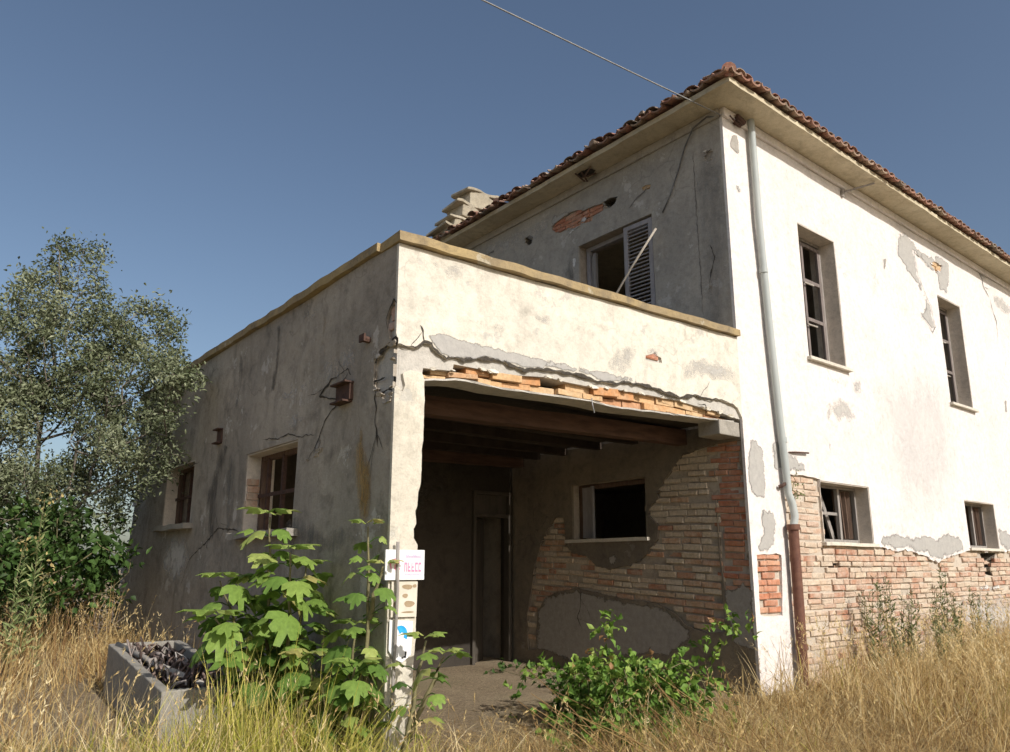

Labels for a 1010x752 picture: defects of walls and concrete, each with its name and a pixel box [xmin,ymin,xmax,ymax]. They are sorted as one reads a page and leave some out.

spalling [550,197,618,234]
spalling [898,233,949,332]
spalling [372,298,397,361]
spalling [422,333,734,424]
crack [182,518,237,581]
spalling [527,441,1010,685]